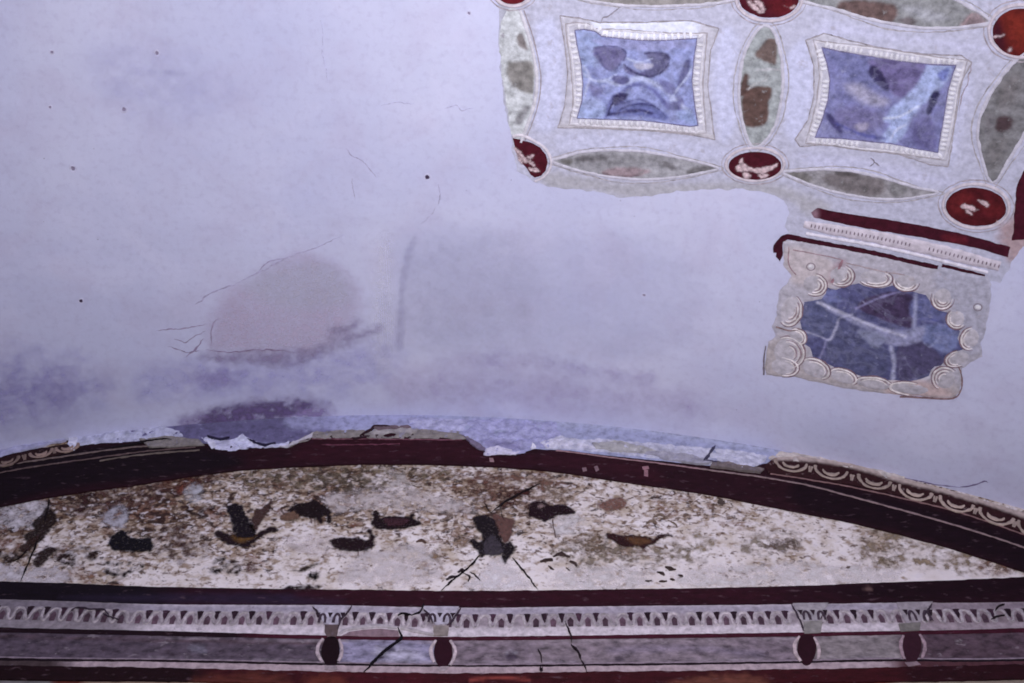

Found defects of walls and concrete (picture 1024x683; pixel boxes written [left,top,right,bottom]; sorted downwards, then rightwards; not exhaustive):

damp [155,319,314,363]
damp [184,400,324,425]
flaking render [0,415,905,479]
crack [484,483,540,519]
crack [512,557,537,588]
crack [364,555,480,672]
crack [565,621,587,672]